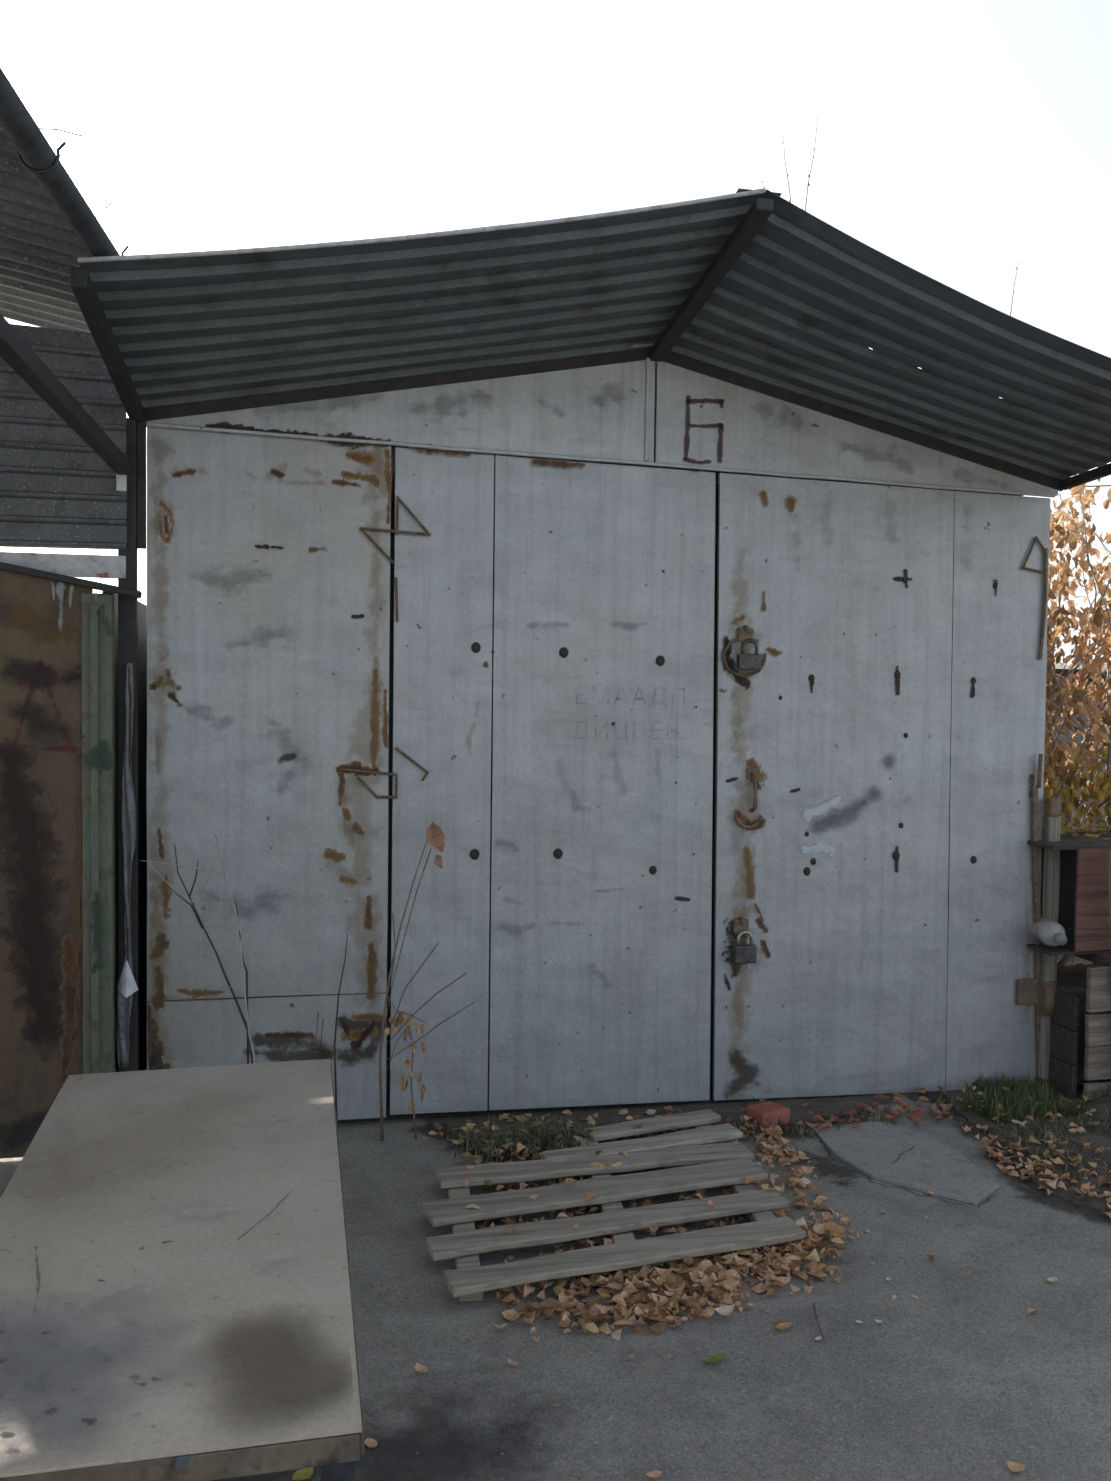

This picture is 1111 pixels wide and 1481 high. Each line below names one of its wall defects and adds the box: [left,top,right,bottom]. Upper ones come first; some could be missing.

corrosion [172,469,196,477]
corrosion [205,422,472,524]
corrosion [532,459,586,468]
corrosion [159,500,175,543]
corrosion [149,668,182,704]
corrosion [723,591,767,690]
corrosion [335,668,389,836]
corrosion [746,758,767,790]
corrosion [734,809,766,900]
corrosion [0,737,82,1085]
corrosion [245,848,388,1064]
corrosion [722,917,771,978]